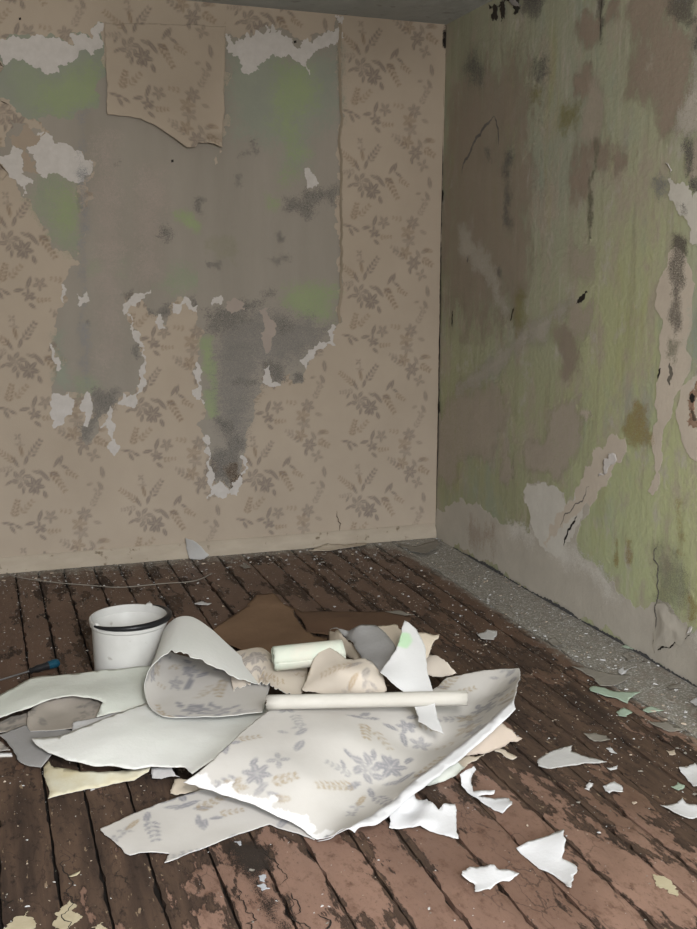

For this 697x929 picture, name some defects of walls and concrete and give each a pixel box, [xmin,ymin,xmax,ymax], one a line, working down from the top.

flaking render [489,0,545,21]
leakage [186,285,336,488]
crack [437,116,499,469]
flaking render [435,380,697,686]
crack [543,434,627,548]
peeling [648,135,697,496]